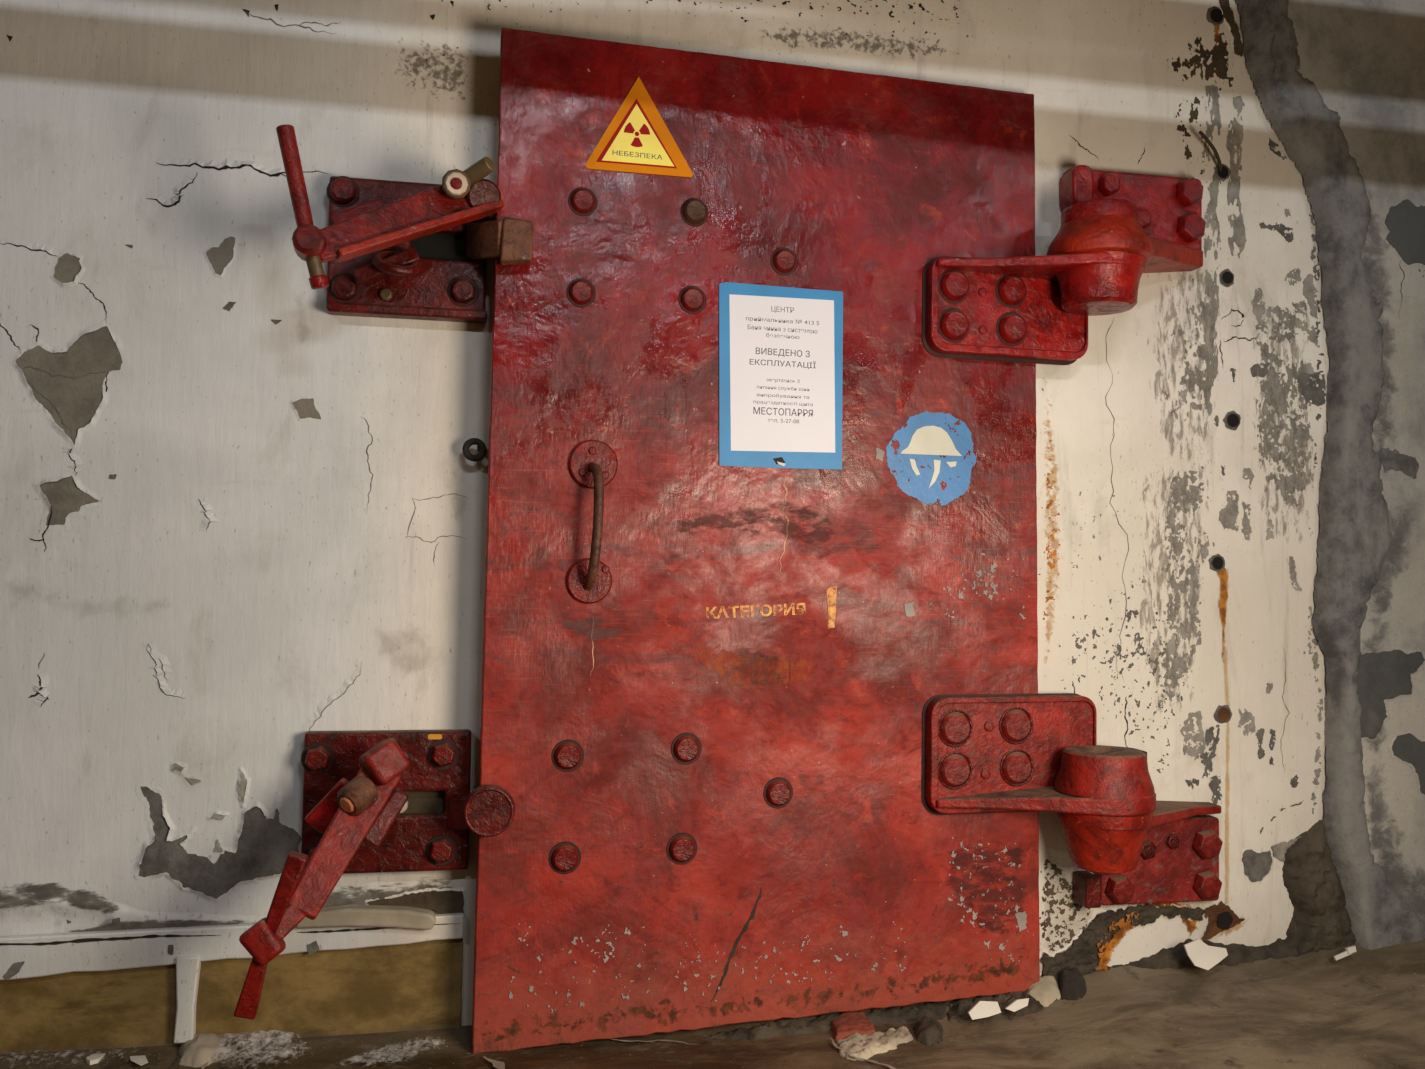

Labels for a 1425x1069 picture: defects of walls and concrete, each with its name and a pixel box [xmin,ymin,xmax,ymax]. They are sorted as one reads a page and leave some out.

crack [0,237,61,257]
crack [80,283,107,322]
crack [146,157,330,207]
peeling [10,319,128,452]
peeling [1140,0,1327,814]
corrosion [1039,428,1061,620]
damp [1373,523,1408,611]
corrosion [1217,568,1229,706]
peeling [133,766,302,903]
damp [1368,782,1425,921]
corrosion [1097,924,1134,971]
spalling [1039,901,1245,977]